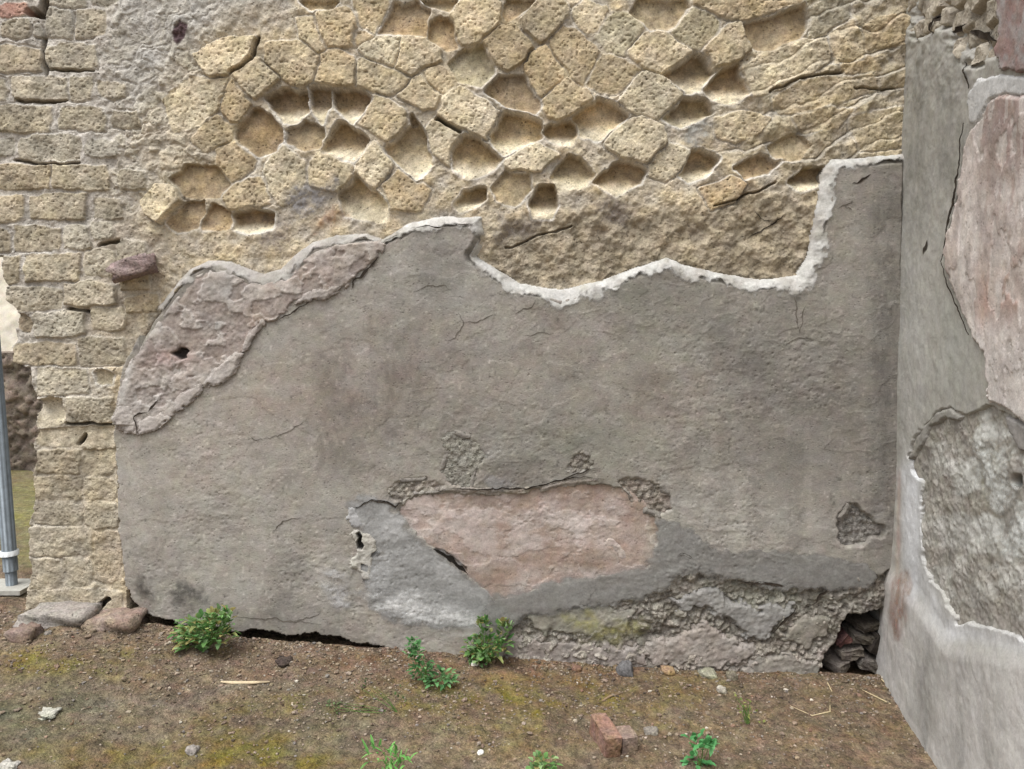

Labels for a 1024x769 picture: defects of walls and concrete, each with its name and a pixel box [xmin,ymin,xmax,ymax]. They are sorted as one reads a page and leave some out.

peeling [111,240,386,436]
peeling [909,0,1024,639]
peeling [346,507,377,582]
crack [433,549,468,574]
crack [444,468,599,491]
spalling [388,430,672,598]
spalling [836,503,883,545]
crack [246,614,319,624]
spalling [503,570,887,674]